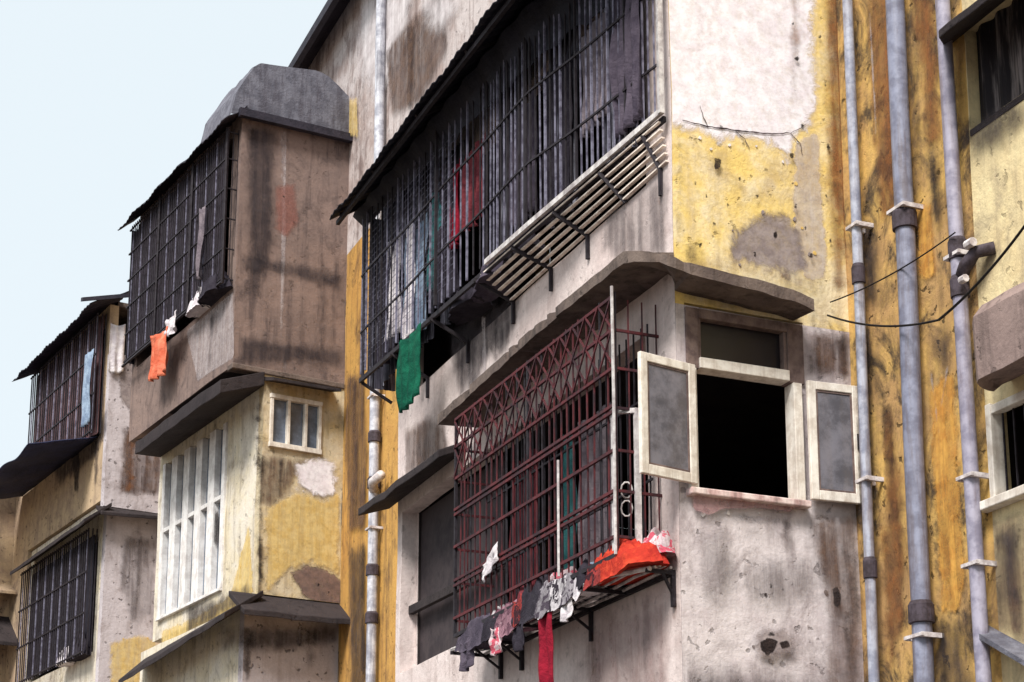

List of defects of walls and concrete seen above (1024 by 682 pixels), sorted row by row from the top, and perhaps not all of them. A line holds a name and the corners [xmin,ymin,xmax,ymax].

damp [250,129,337,307]
crack [682,107,806,155]
peeling [669,0,827,279]
damp [929,151,939,221]
peeling [265,459,340,603]
damp [819,443,871,682]
spalling [752,629,794,664]